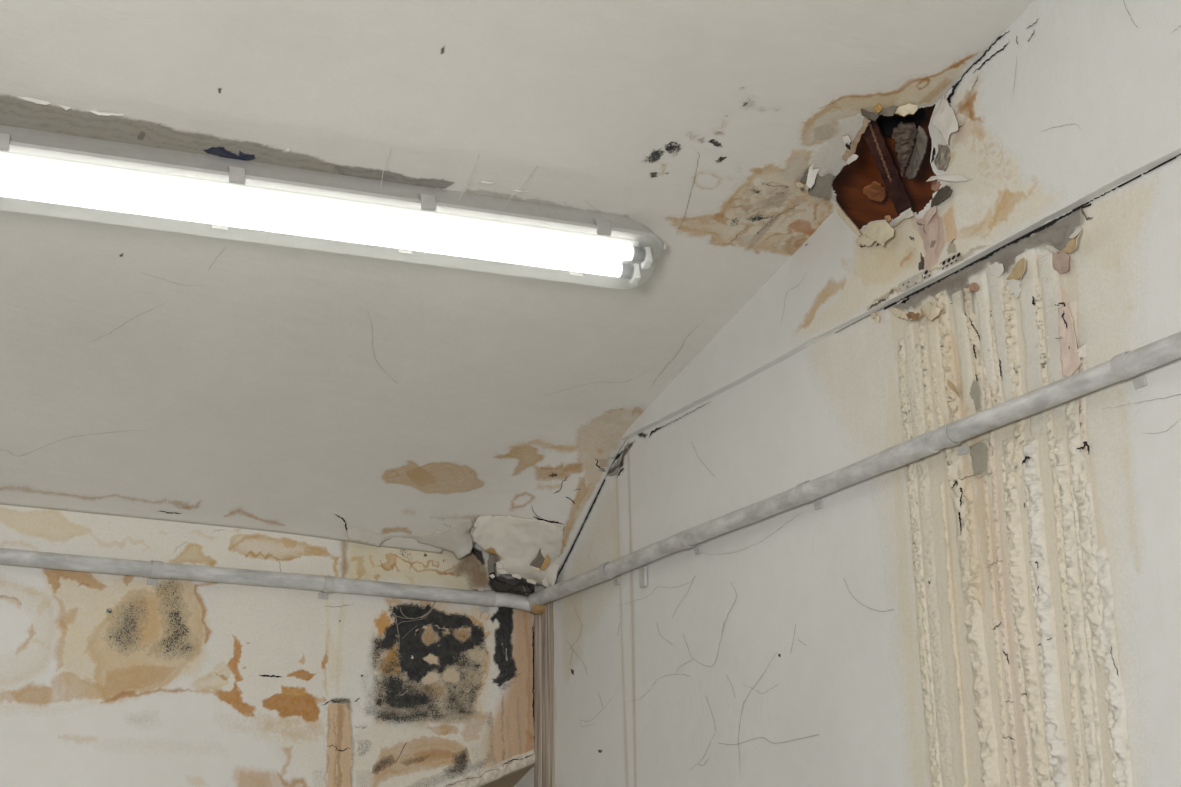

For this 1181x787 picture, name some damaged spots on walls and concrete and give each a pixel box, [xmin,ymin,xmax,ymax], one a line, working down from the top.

flaking render [795,94,1082,322]
water stain [0,483,490,591]
water stain [379,459,486,495]
water stain [492,403,647,579]
water stain [0,568,535,787]
crack [529,626,537,723]
water stain [556,569,638,787]
flaking render [322,696,360,787]
crack [446,753,534,787]